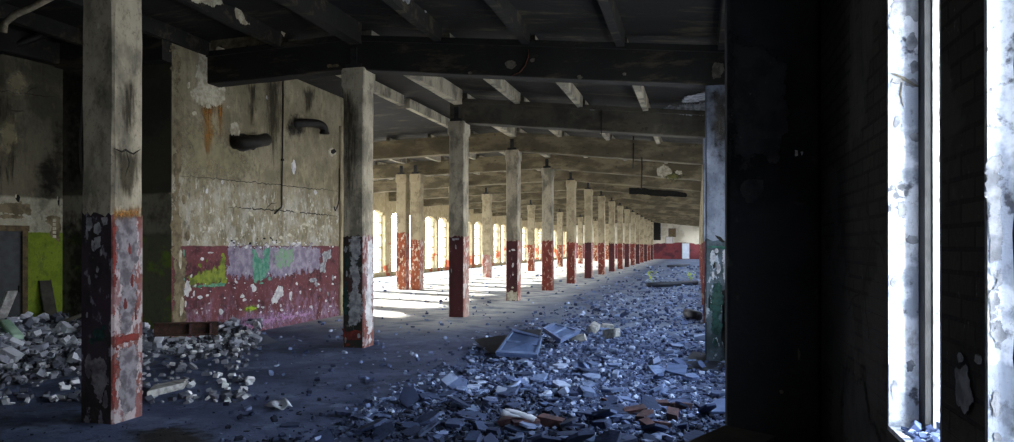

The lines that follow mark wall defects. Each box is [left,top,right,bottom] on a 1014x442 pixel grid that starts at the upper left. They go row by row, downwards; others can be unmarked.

peeling [888,0,919,88]
spalling [0,194,31,219]
rust [181,105,249,180]
spalling [169,8,374,346]
peeling [85,215,141,414]
peeling [708,235,725,353]
peeling [955,352,982,415]